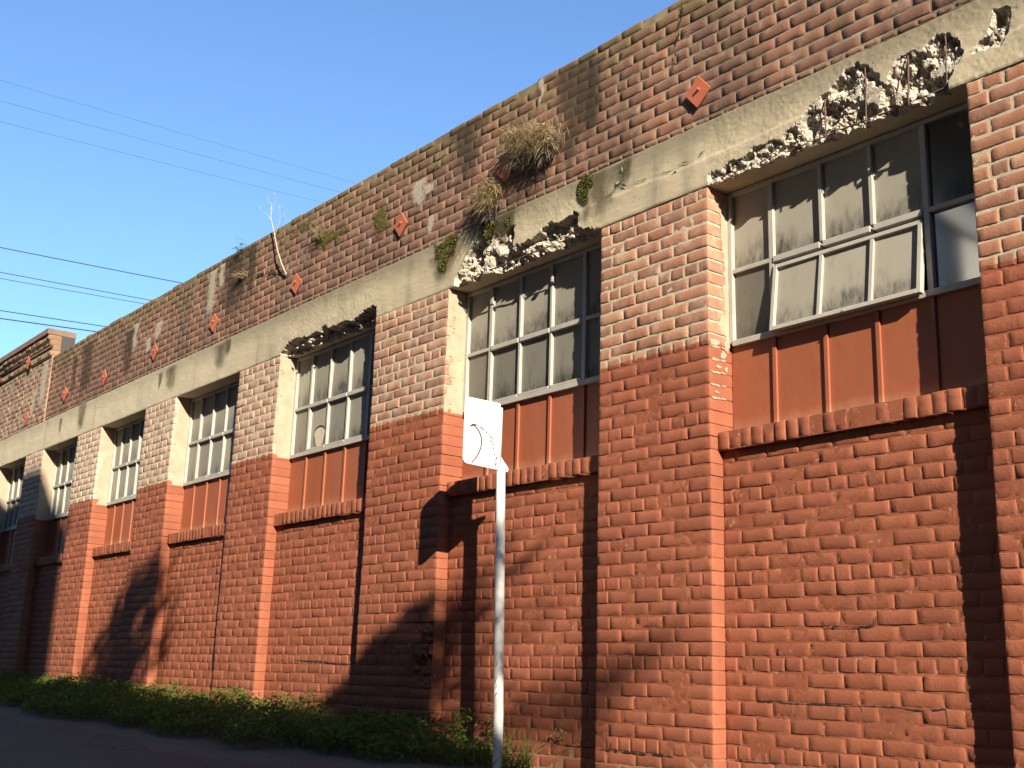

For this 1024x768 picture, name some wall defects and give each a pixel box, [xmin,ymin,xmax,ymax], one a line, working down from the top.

spalling [708,4,1013,185]
spalling [454,210,601,287]
spalling [280,304,377,357]